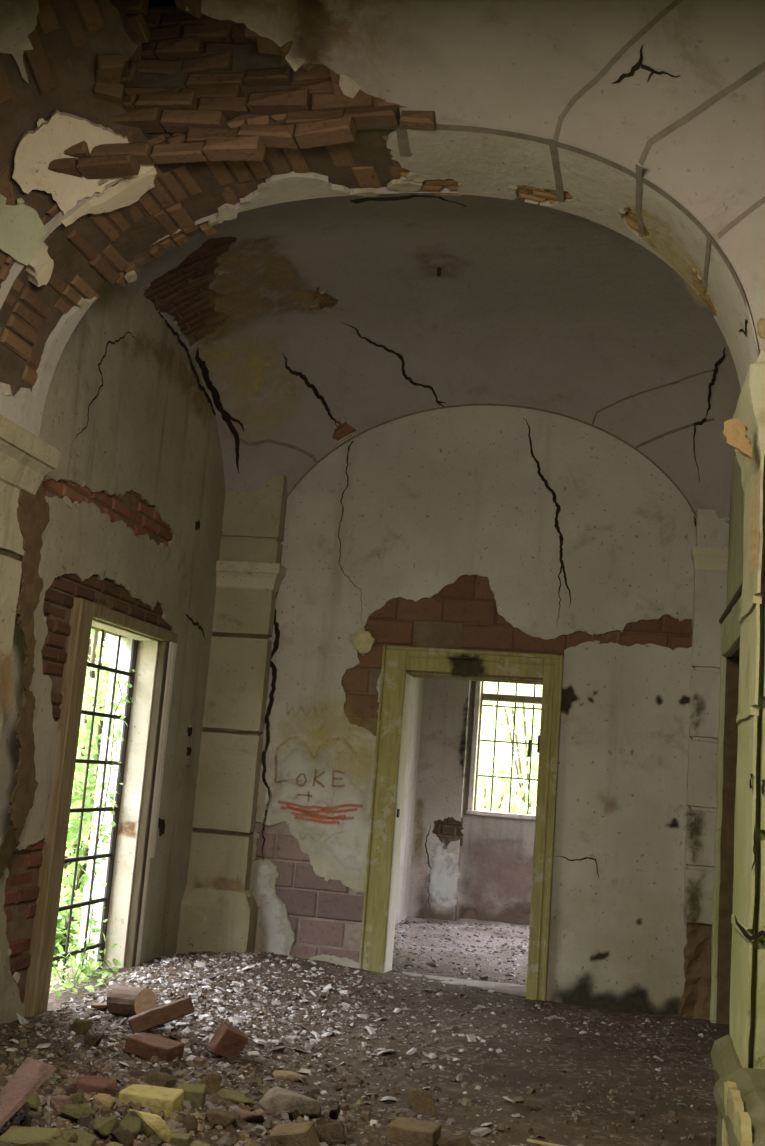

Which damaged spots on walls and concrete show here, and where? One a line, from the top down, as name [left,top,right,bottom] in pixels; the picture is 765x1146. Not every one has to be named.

crack [611,45,680,84]
crack [152,301,244,473]
crack [343,323,446,407]
crack [525,419,571,624]
flaking render [342,575,692,736]
spalling [3,476,177,1003]
flaking render [252,821,364,963]
flaking render [432,814,466,852]
crack [734,915,765,941]